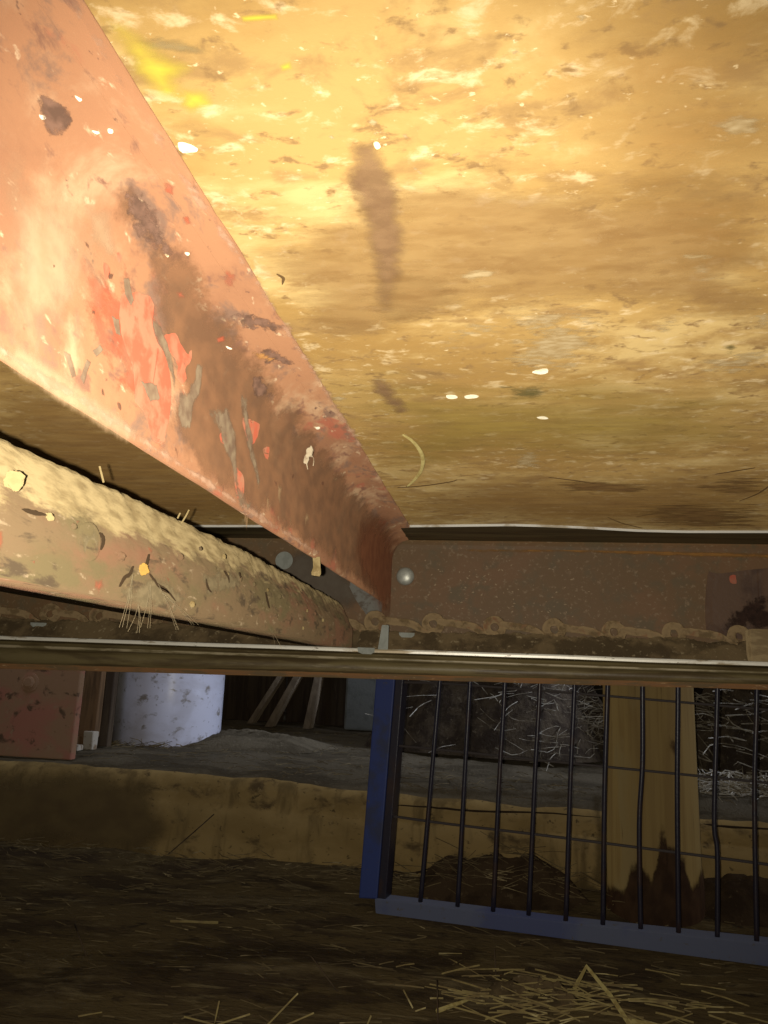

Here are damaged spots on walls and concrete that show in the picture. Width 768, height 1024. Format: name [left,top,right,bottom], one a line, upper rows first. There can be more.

water stain [291,147,743,324]
rust [124,278,134,305]
peeling [234,314,284,331]
rust [64,345,103,383]
peeling [89,252,192,444]
rust [141,381,160,402]
peeling [243,418,270,459]
rust [153,253,394,609]
peeling [234,468,244,499]